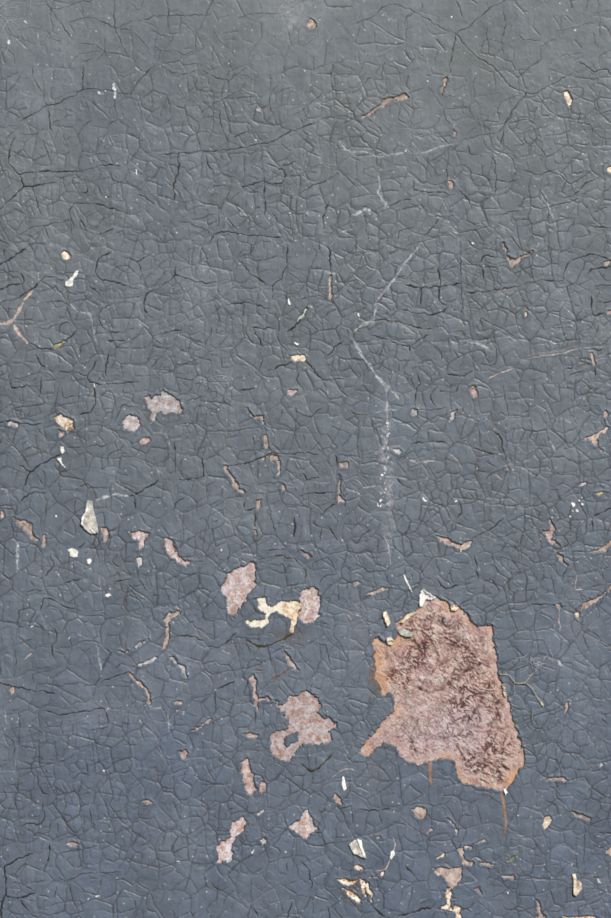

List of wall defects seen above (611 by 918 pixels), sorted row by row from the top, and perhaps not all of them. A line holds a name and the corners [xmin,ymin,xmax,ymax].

crack [348,0,611,496]
crack [0,0,389,680]
peeling [145,390,183,421]
peeling [221,562,320,633]
crack [437,518,606,628]
crack [0,556,109,753]
peeling [249,675,337,761]
corrosion [361,589,525,833]
crack [0,845,119,918]
peeling [216,817,246,863]
peeling [289,809,319,839]
peeling [435,839,494,918]